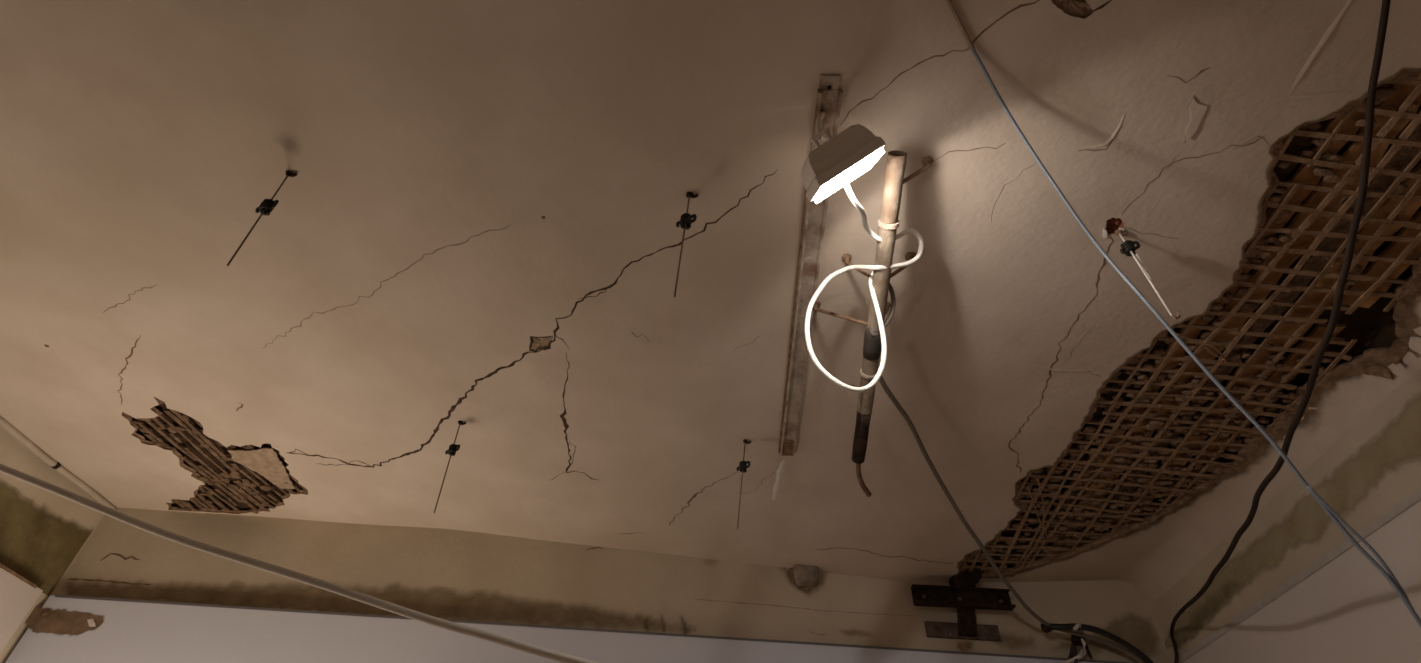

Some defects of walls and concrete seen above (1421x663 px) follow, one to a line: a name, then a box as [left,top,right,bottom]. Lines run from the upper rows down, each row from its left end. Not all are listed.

crack [840,0,1040,125]
flaking render [1051,0,1093,19]
crack [1167,67,1210,83]
crack [934,143,1035,220]
crack [264,169,778,481]
crack [1008,136,1269,473]
spalling [957,68,1421,578]
spalling [122,397,308,514]
leakage [1088,397,1421,653]
flaking render [25,607,104,636]